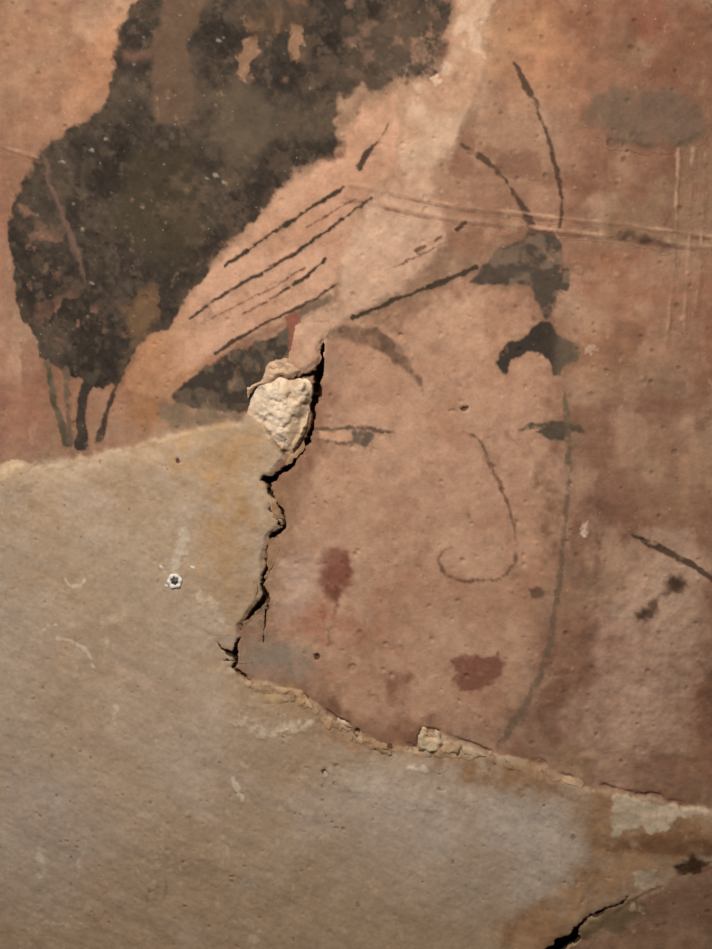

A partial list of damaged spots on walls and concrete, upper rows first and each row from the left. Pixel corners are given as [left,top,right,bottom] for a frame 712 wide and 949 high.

spalling [0,458,38,482]
crack [217,342,325,679]
spalling [578,520,591,539]
spalling [634,525,674,552]
spalling [244,677,520,771]
spalling [607,791,710,839]
crack [545,896,628,949]